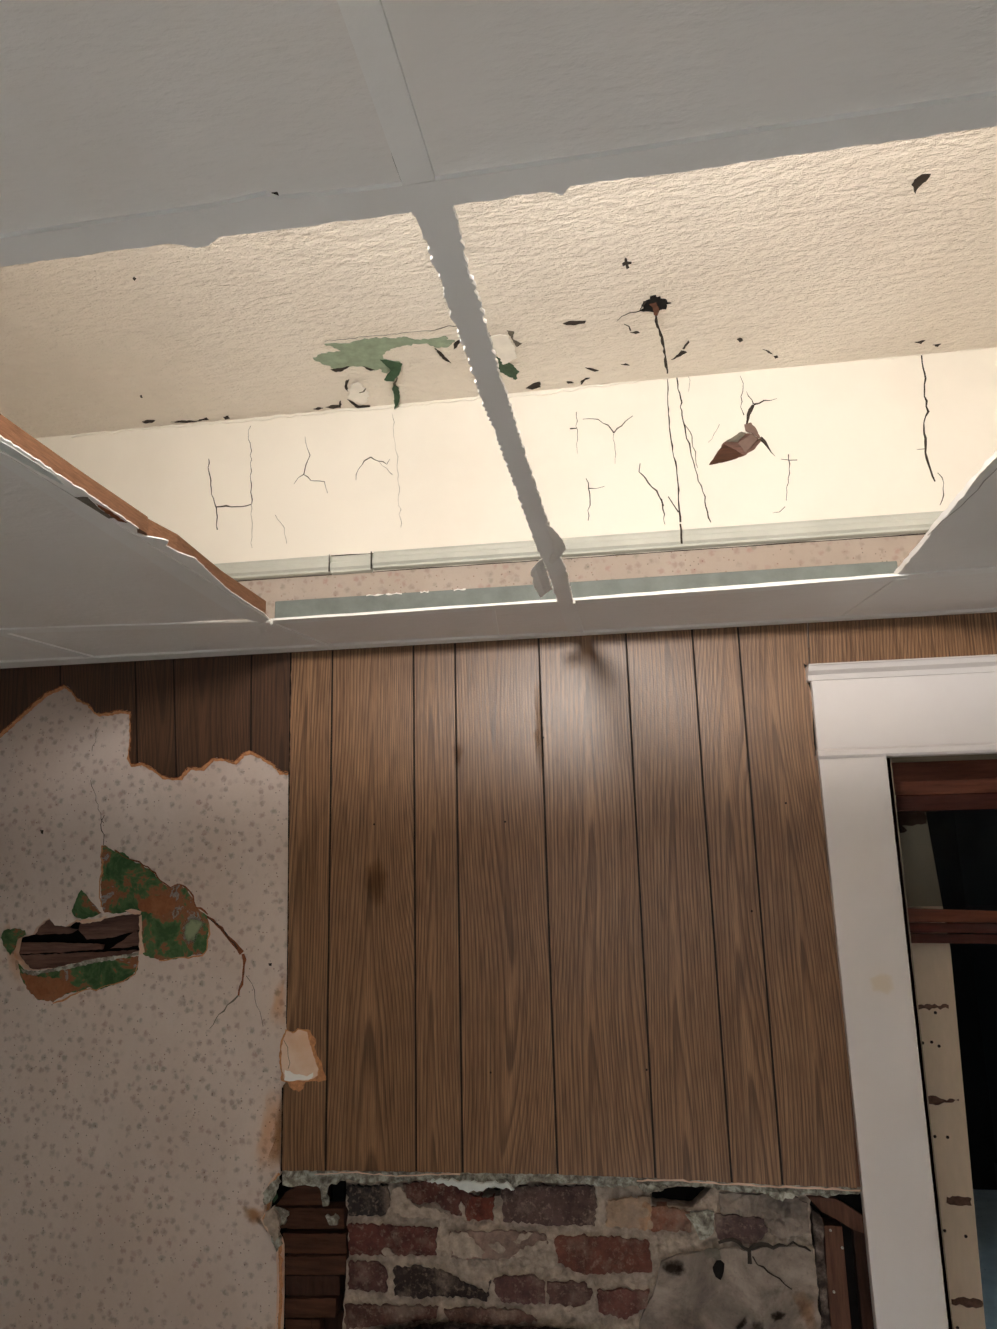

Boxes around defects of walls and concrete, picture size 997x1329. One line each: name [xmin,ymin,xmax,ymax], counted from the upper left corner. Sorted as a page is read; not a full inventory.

crack [208,426,287,546]
crack [294,440,328,493]
crack [356,414,402,525]
peeling [313,336,460,410]
peeling [489,330,541,390]
crack [570,316,720,524]
flaking render [709,376,777,465]
crack [774,454,793,513]
crack [917,355,944,505]
flaking render [1,845,211,1004]
crack [206,915,263,1029]
crack [752,1256,792,1290]